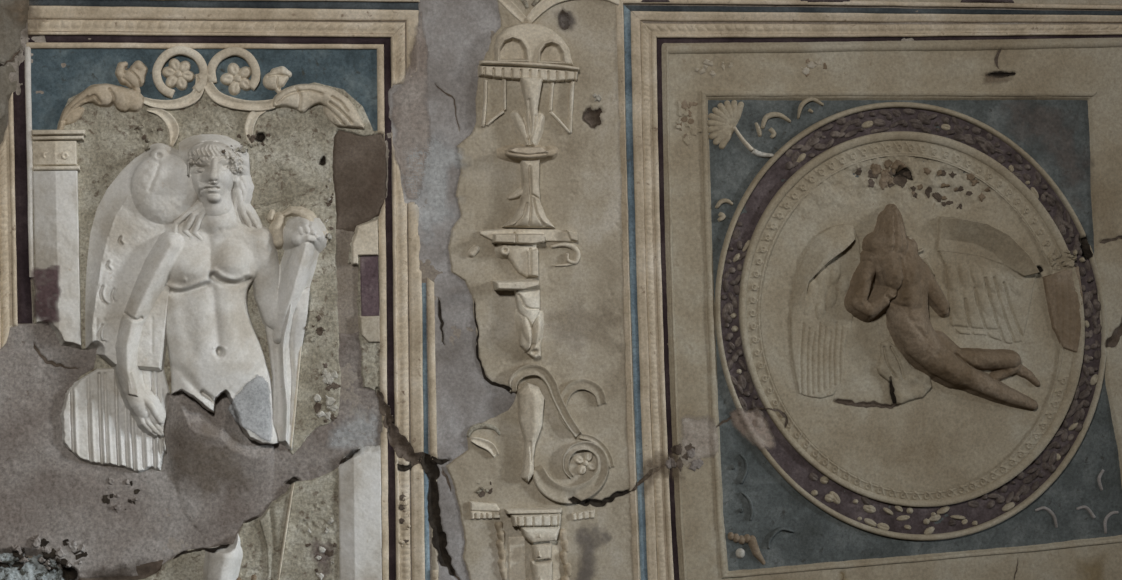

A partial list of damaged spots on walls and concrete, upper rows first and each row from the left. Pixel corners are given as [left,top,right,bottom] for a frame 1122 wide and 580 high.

crack [993,49,1001,69]
spalling [583,94,602,128]
flaking render [855,159,990,209]
crack [1100,235,1122,244]
crack [1106,323,1122,348]
crack [340,449,360,463]
crack [377,390,460,580]
crack [568,464,666,507]
spalling [0,534,88,580]
crack [173,517,258,559]